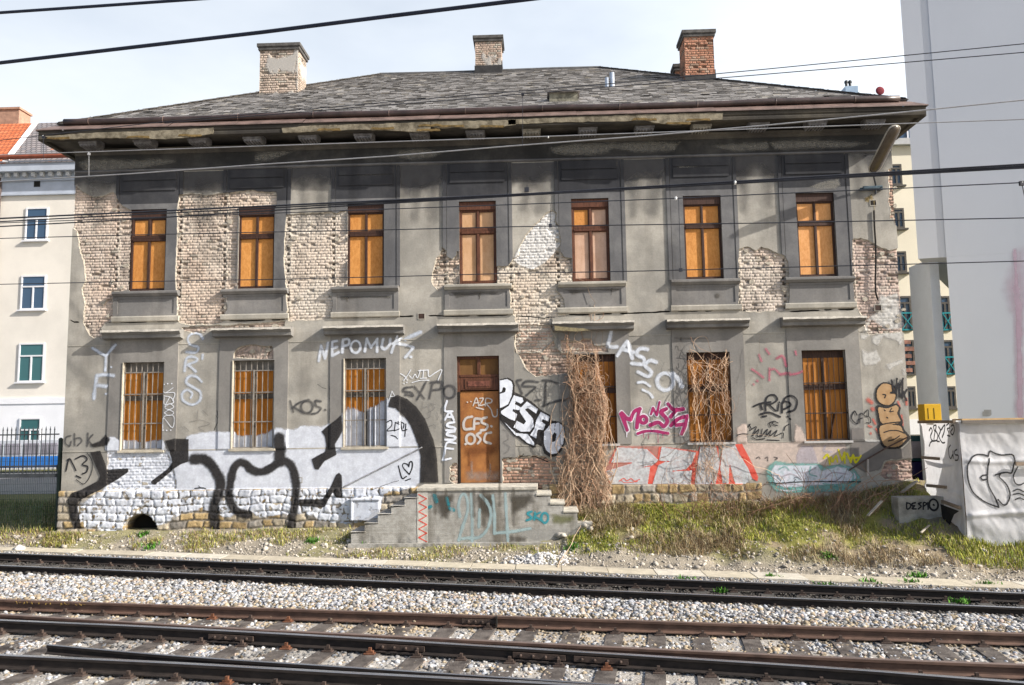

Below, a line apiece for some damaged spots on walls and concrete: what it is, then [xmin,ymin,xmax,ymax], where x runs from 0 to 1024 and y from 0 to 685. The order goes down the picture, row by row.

spalling [73,186,132,340]
spalling [175,190,348,333]
spalling [431,247,459,291]
spalling [497,209,608,377]
spalling [738,246,790,313]
spalling [852,238,915,372]
spalling [502,455,563,490]